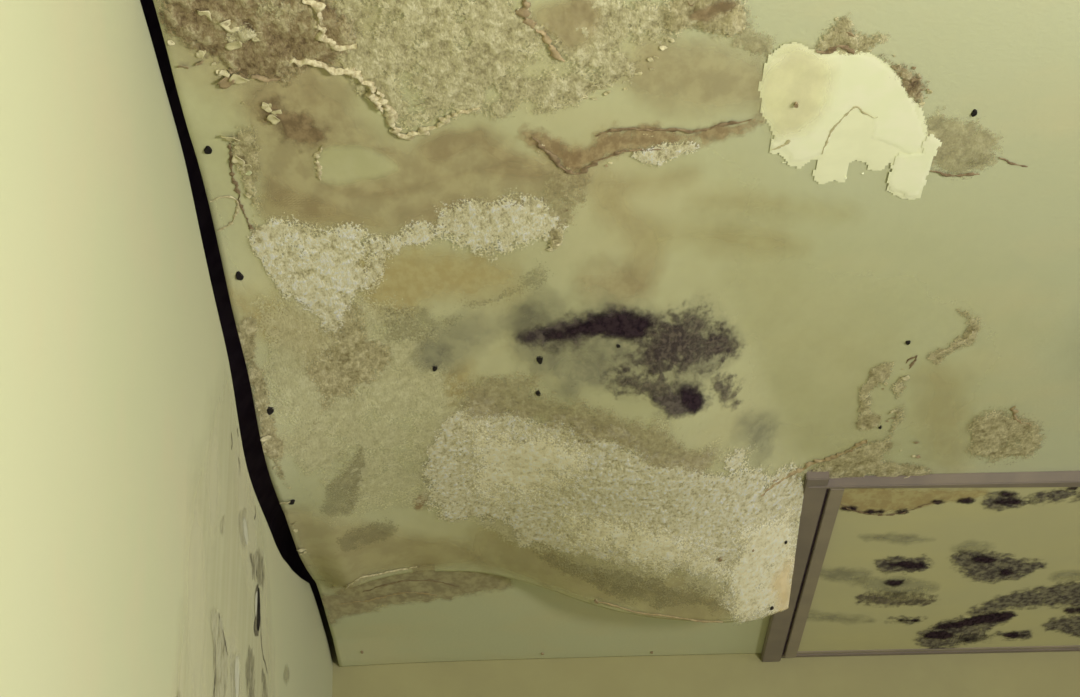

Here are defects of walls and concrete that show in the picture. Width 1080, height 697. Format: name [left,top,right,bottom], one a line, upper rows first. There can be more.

flaking render [157,0,751,141]
flaking render [758,12,980,200]
flaking render [210,102,282,244]
flaking render [545,227,564,252]
damp [247,91,804,623]
flaking render [964,406,1047,465]
damp [841,500,942,516]
damp [957,487,1080,511]
damp [822,544,1080,649]